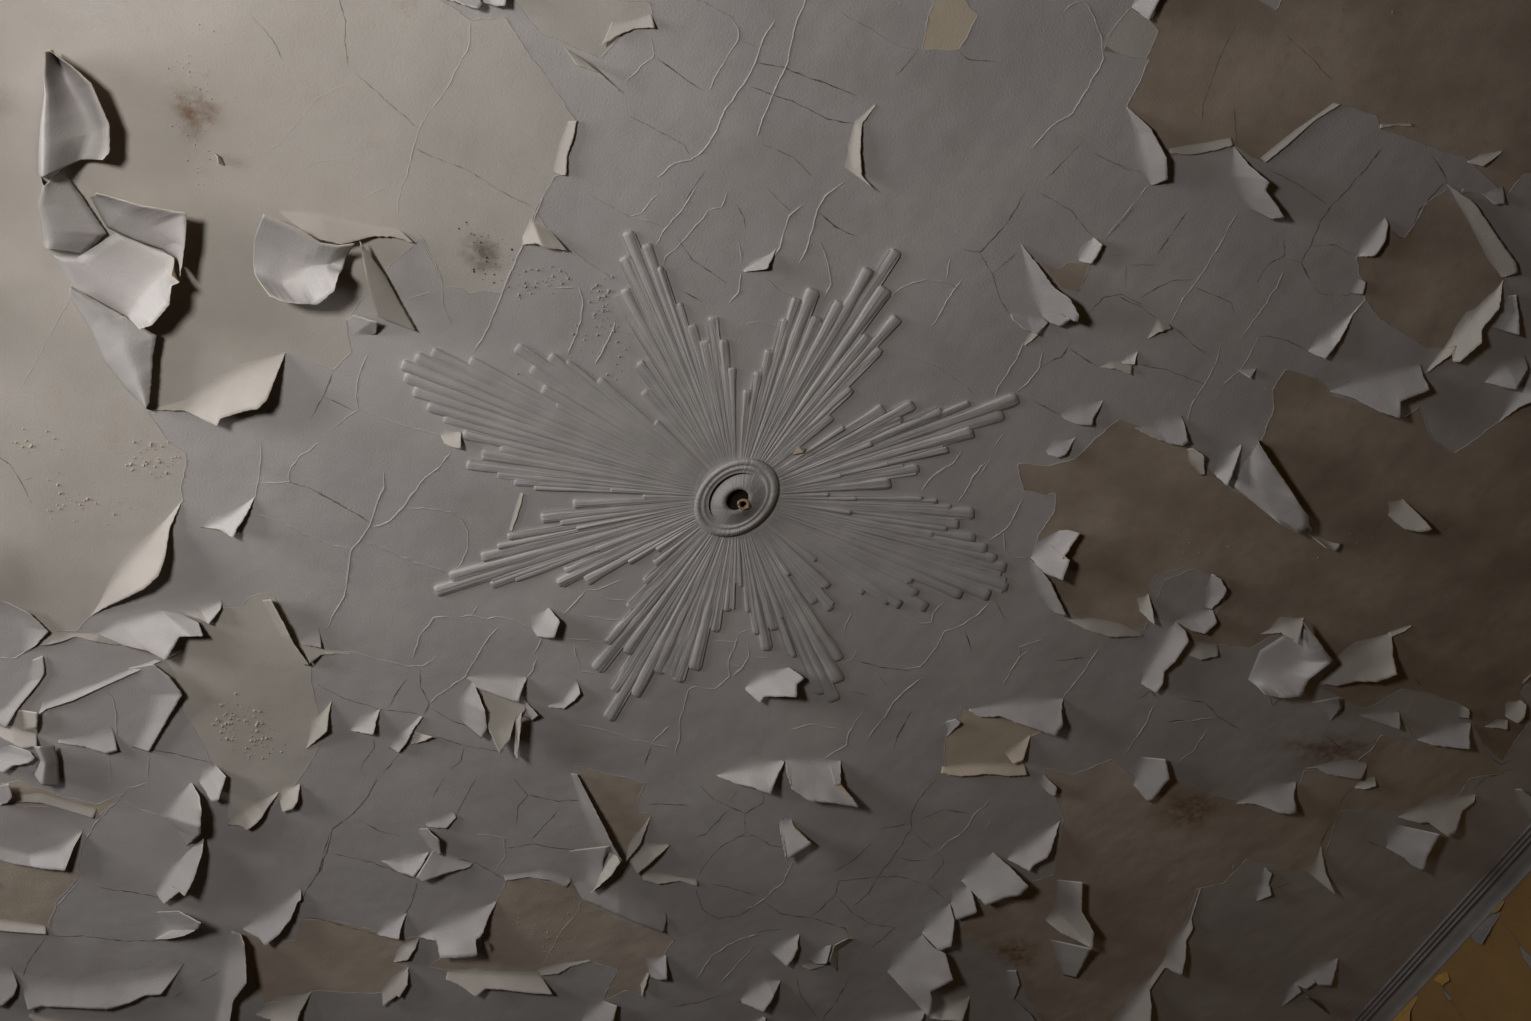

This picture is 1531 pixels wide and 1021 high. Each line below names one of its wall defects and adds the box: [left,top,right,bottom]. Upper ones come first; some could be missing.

crack [339,0,620,364]
crack [587,0,918,328]
peeling [0,964,184,1021]
crack [23,686,214,976]
peeling [0,0,655,939]
crack [299,745,418,934]
crack [252,351,627,880]
peeling [212,766,698,1021]
peeling [745,668,804,703]
peeling [717,756,859,808]
peeling [741,934,854,1021]
peeling [863,0,1531,1021]